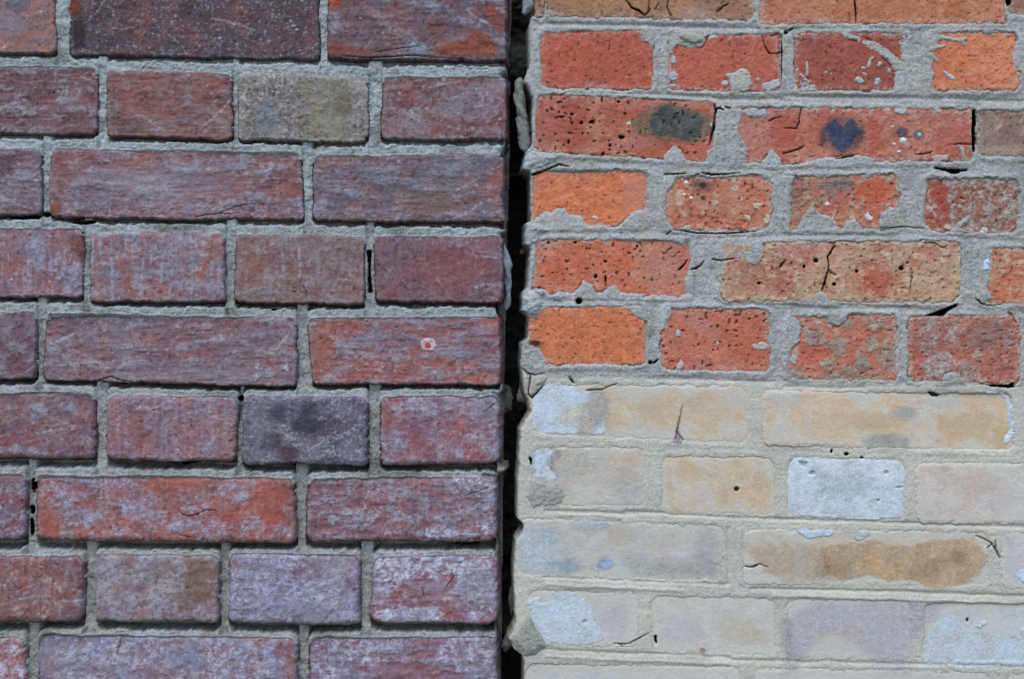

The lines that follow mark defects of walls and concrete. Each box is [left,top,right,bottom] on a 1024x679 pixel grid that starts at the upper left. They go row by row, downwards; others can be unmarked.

crack [762,34,783,79]
crack [710,107,730,142]
crack [821,246,834,290]
peeling [531,383,607,435]
peeling [761,457,988,588]
peeling [528,590,604,646]
peeling [923,615,1024,669]